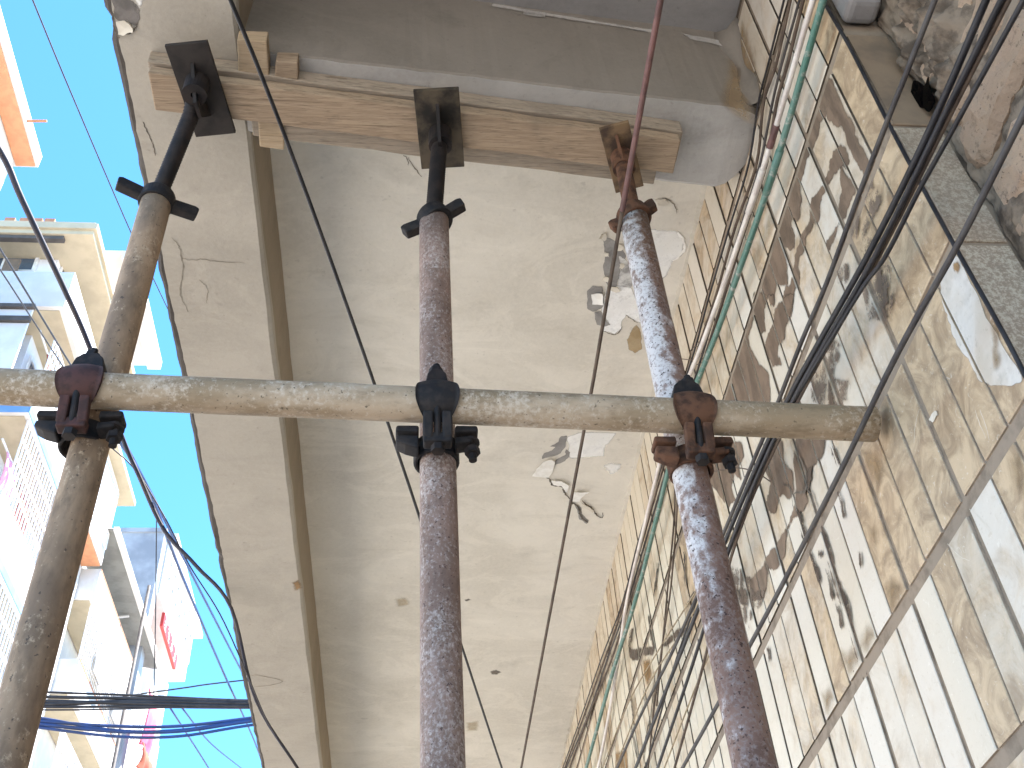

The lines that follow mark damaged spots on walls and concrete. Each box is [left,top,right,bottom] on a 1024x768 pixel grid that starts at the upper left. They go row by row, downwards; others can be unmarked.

damp [726,28,756,119]
crack [171,237,242,312]
flaking render [587,233,642,353]
damp [725,78,893,405]
flaking render [532,433,620,524]
damp [710,441,744,507]
damp [732,439,840,627]
damp [809,526,871,679]